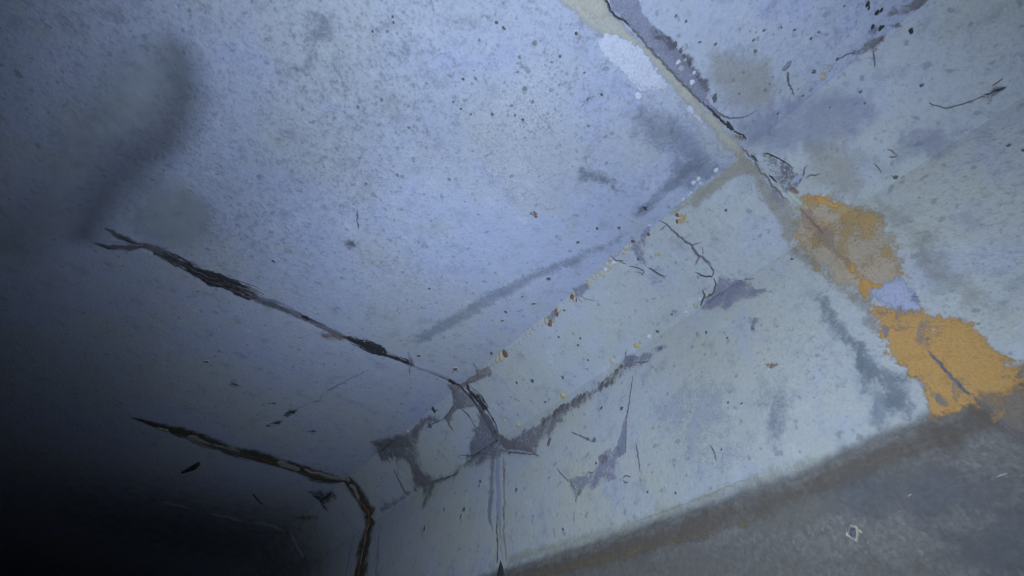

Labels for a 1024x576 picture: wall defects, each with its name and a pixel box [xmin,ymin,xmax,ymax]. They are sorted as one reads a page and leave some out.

crack [604,0,824,234]
crack [93,228,416,368]
crack [658,220,714,278]
corrosion [793,193,1024,440]
crack [465,384,504,439]
crack [927,350,1024,444]